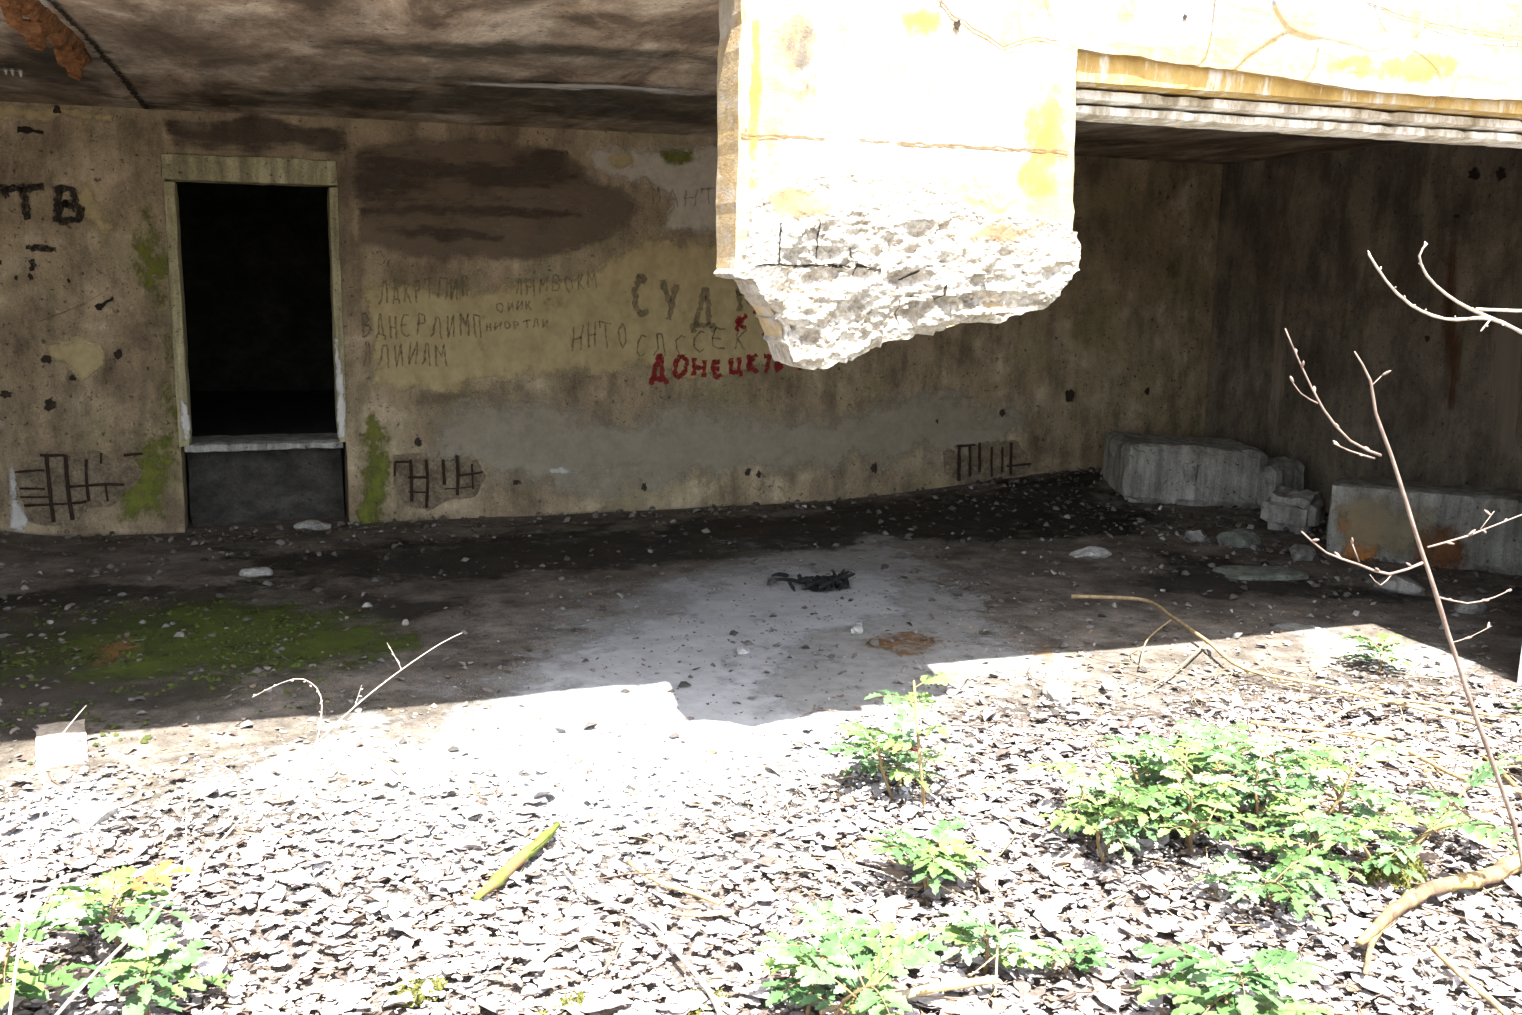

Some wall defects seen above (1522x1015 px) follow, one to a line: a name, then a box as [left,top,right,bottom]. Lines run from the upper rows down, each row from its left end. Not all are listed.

corrosion [0,0,93,81]
crack [47,0,149,109]
leakage [744,0,762,152]
leakage [902,8,941,32]
crack [939,0,1078,54]
peeling [1090,0,1522,80]
crack [1363,0,1522,47]
spalling [362,59,1081,393]
leakage [427,390,1026,499]
leakage [0,465,1155,743]